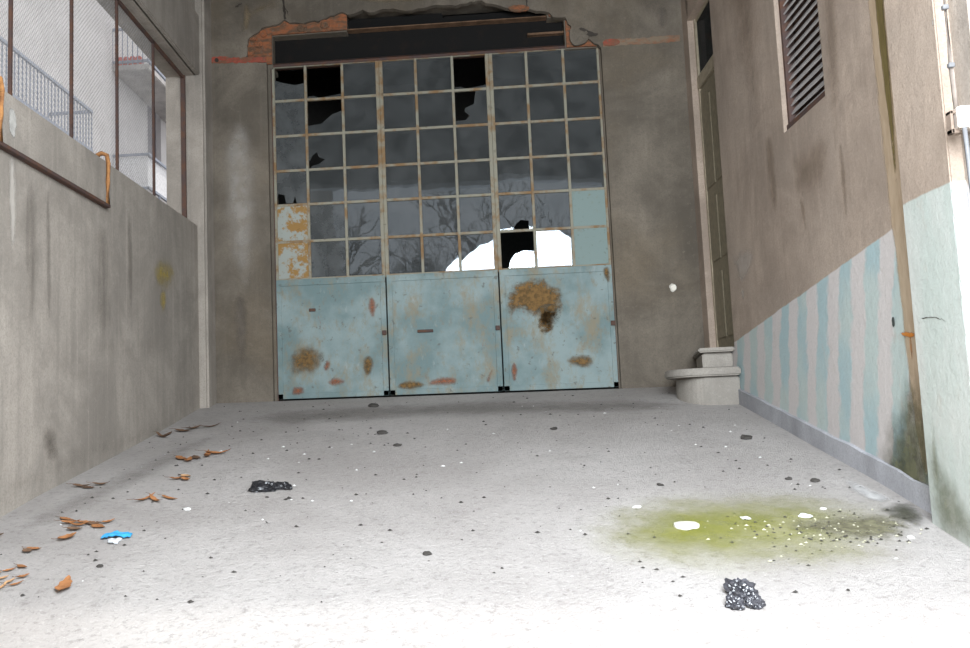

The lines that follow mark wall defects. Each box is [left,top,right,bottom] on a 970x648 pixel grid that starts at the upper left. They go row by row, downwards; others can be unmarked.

flaking render [211,14,347,65]
flaking render [565,20,680,48]
peeling [951,181,970,376]
corrosion [509,282,561,332]
corrosion [293,350,329,370]